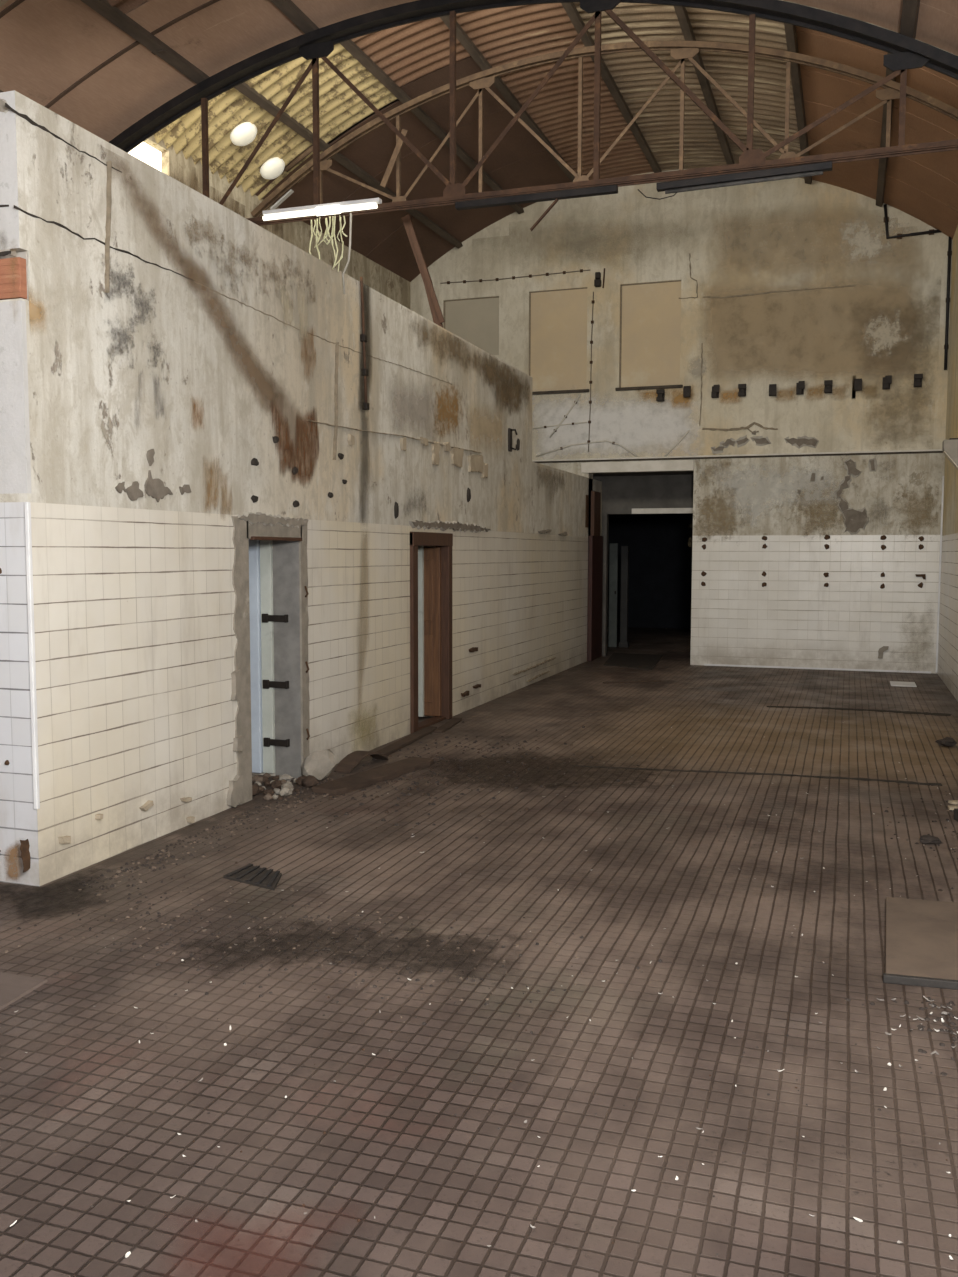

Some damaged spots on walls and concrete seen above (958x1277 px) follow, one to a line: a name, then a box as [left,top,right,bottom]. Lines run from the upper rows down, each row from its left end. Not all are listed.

crack [0,103,482,460]
peeling [115,449,191,502]
corrosion [271,405,319,482]
flaking render [834,457,878,535]
spalling [20,839,31,873]